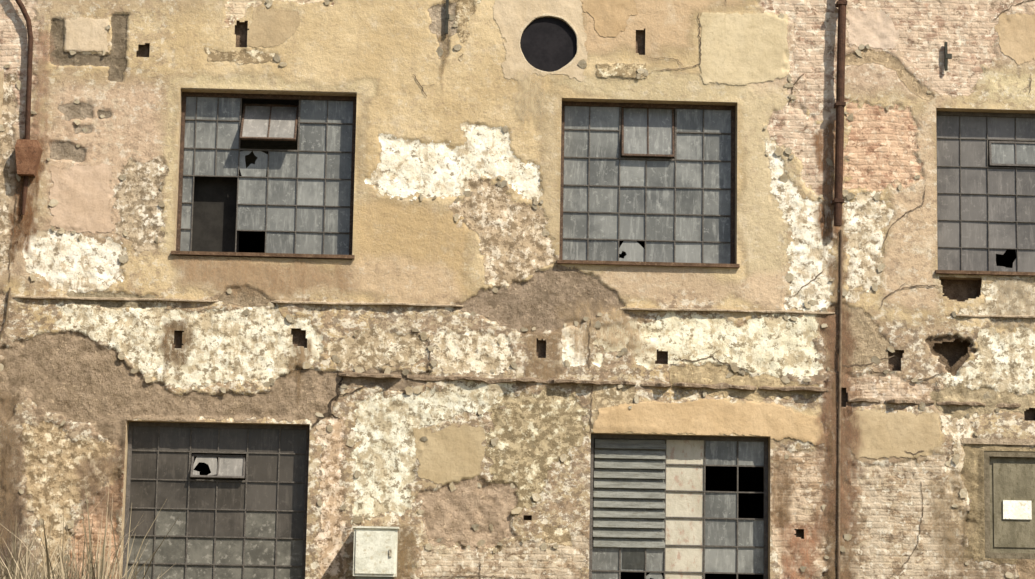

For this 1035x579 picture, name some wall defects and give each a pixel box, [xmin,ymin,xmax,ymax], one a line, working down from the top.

corrosion [10,162,44,250]
flaking render [0,0,639,579]
flaking render [364,0,1035,579]
leakage [772,454,792,526]
leakage [825,235,855,579]
crack [884,185,926,252]